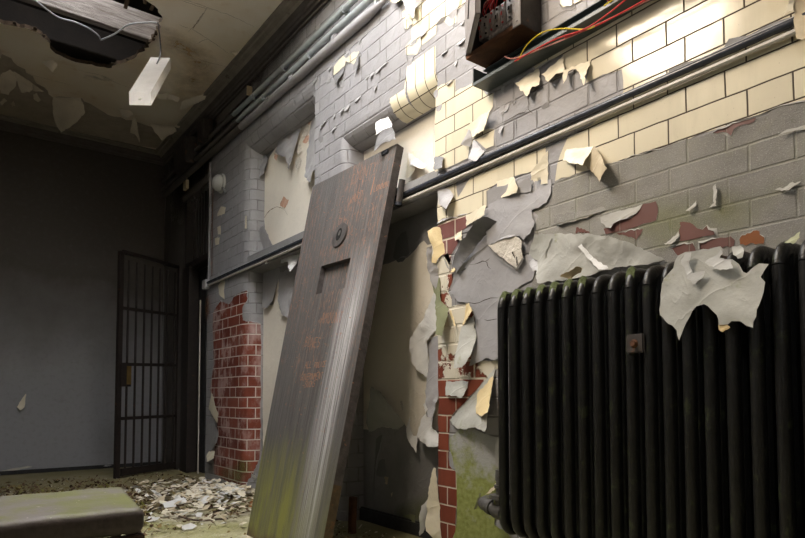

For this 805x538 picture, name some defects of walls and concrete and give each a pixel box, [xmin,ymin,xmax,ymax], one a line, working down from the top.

flaking render [0,54,180,148]
peeling [259,96,361,250]
peeling [313,40,388,98]
peeling [363,0,805,538]
peeling [206,254,299,488]